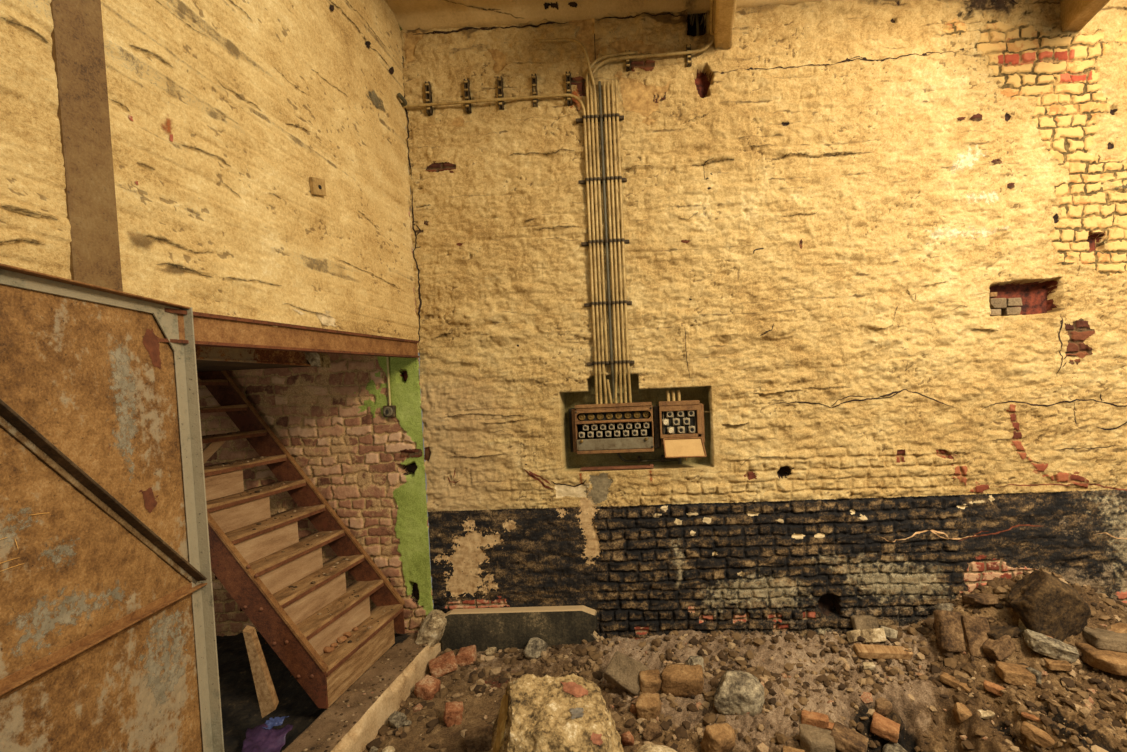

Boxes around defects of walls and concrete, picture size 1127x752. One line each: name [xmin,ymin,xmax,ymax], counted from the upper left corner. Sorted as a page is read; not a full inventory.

spalling [543,2,577,10]
flaking render [942,17,967,36]
damp [958,0,1031,16]
flaking render [974,20,1127,277]
spalling [989,279,1095,365]
crack [1057,315,1078,373]
crack [756,361,953,408]
flaking render [400,447,431,476]
spalling [1006,404,1089,488]
crack [985,394,1127,450]
peeling [432,517,517,610]
spalling [411,582,419,604]